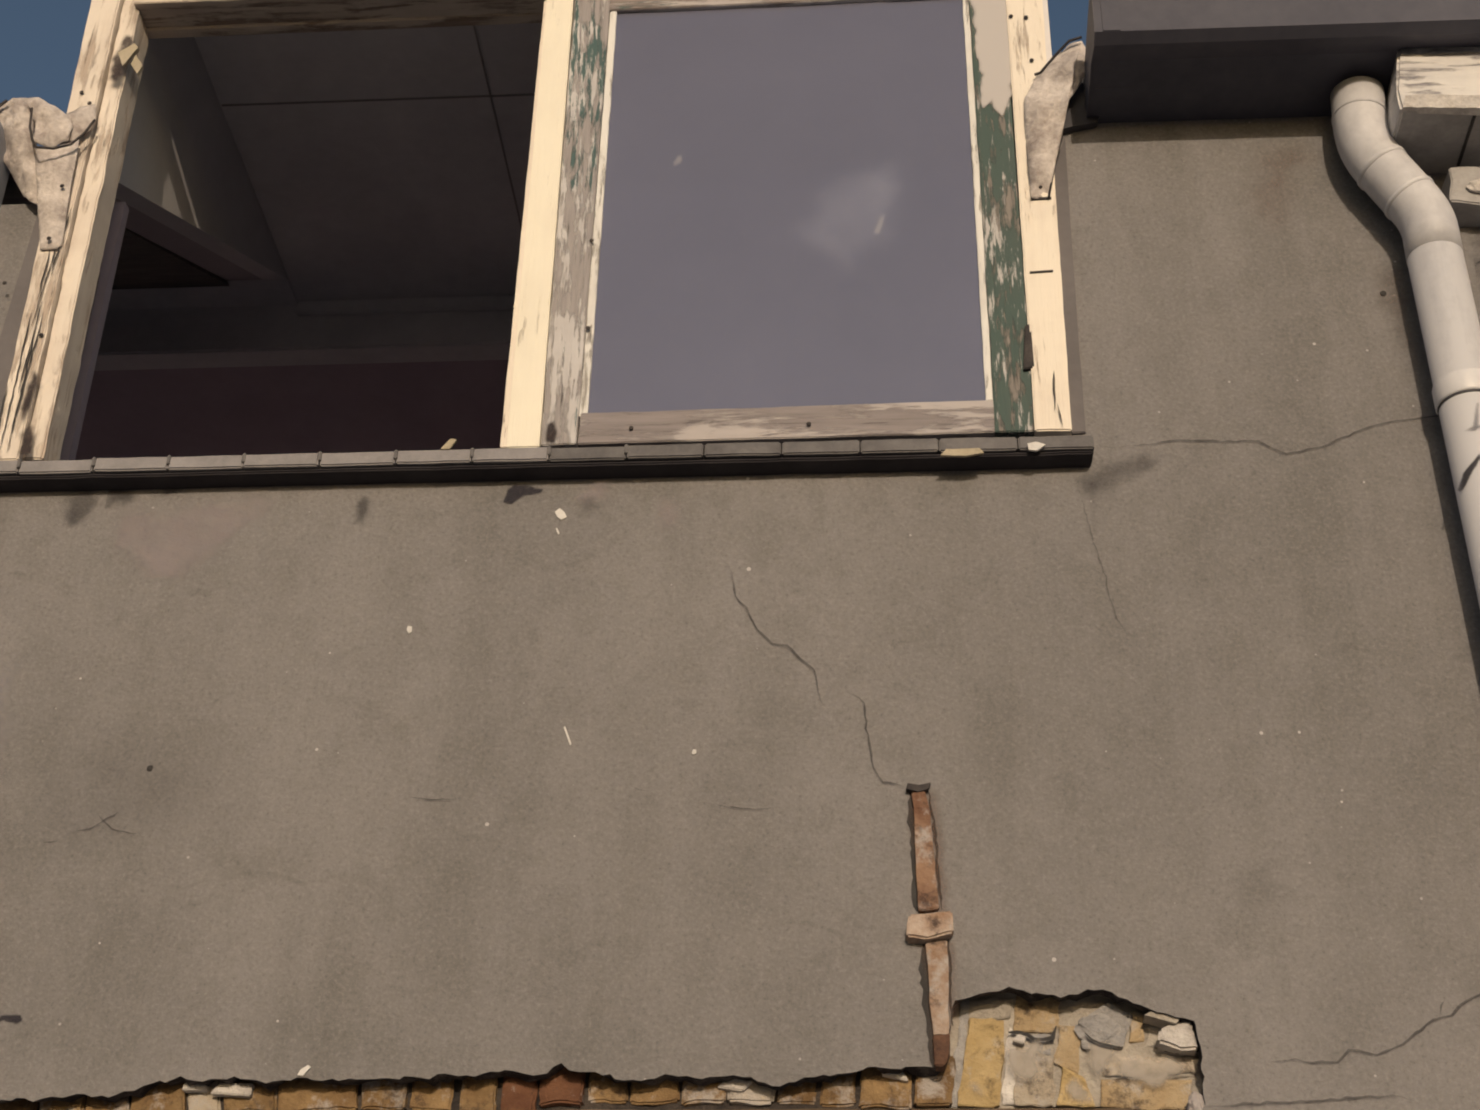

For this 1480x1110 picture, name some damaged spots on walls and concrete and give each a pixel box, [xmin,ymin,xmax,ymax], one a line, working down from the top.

crack [1162,415,1438,454]
crack [1413,994,1480,1036]
spalling [0,993,1205,1110]
crack [1251,1095,1368,1105]